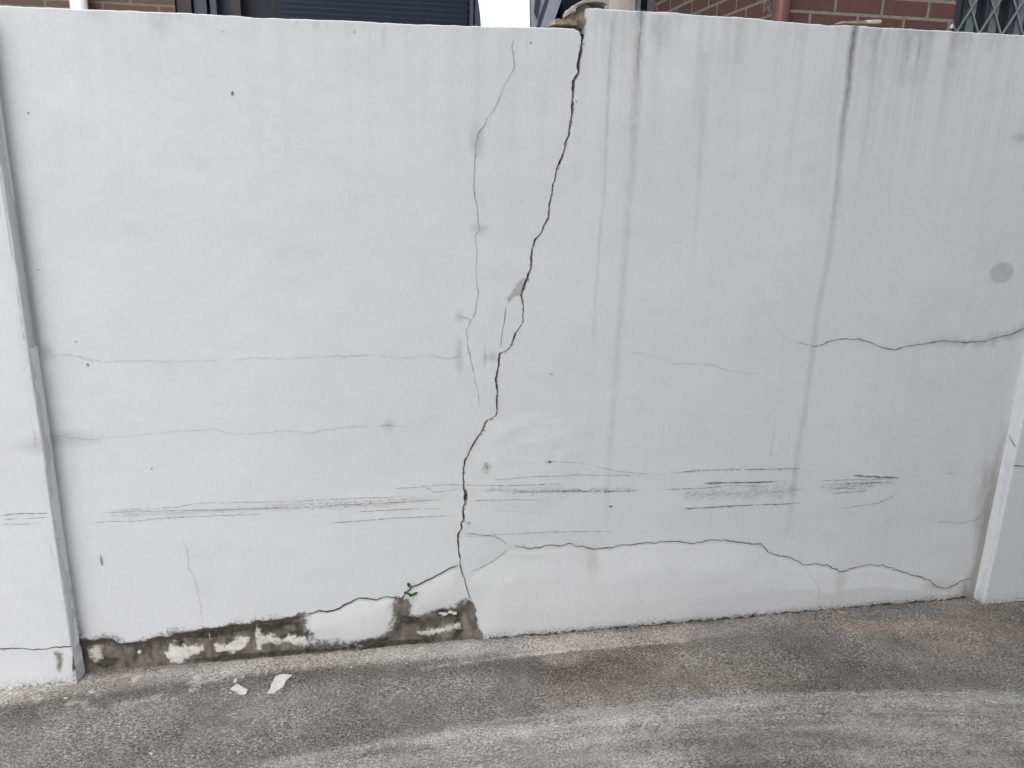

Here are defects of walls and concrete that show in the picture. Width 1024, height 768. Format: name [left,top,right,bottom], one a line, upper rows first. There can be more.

crack [307,34,972,614]
crack [814,328,1024,350]
spalling [72,597,483,676]